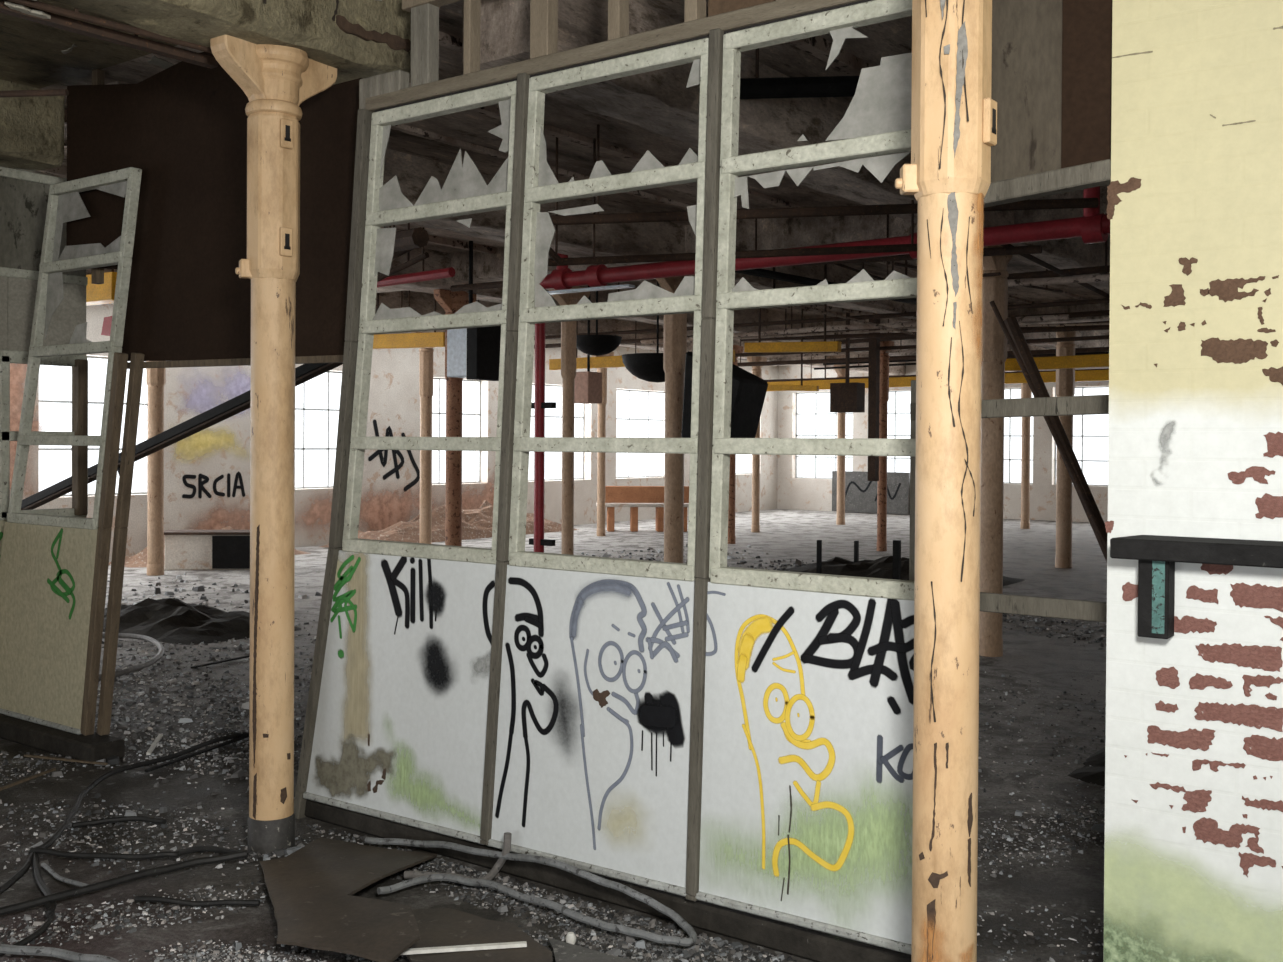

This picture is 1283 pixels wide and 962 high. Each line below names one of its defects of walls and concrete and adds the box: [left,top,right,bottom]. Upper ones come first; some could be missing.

peeling [5,0,51,19]
peeling [944,21,968,158]
spalling [1107,177,1141,220]
peeling [947,192,959,330]
peeling [1122,257,1283,385]
peeling [1227,431,1283,519]
peeling [1122,582,1138,601]
peeling [1146,564,1283,781]
peeling [1150,782,1283,877]
peeling [927,871,948,962]